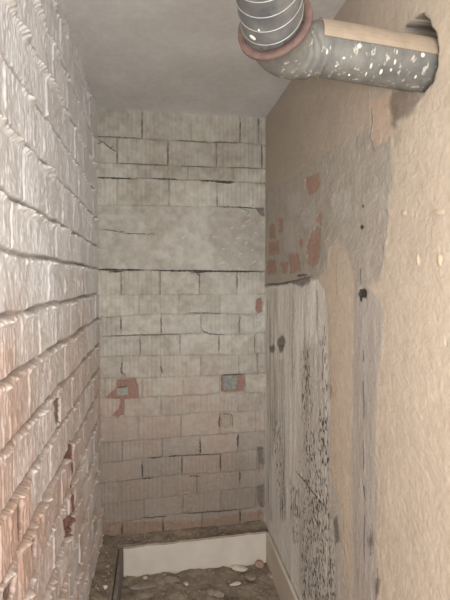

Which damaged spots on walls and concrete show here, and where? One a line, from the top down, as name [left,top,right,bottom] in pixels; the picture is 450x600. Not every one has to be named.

crack [97,121,263,184]
flaking render [265,164,325,282]
crack [99,269,308,291]
spalling [254,296,264,315]
crack [103,319,174,354]
crack [189,312,241,351]
spalling [103,377,140,419]
spalling [220,372,246,394]
leakage [102,268,337,600]